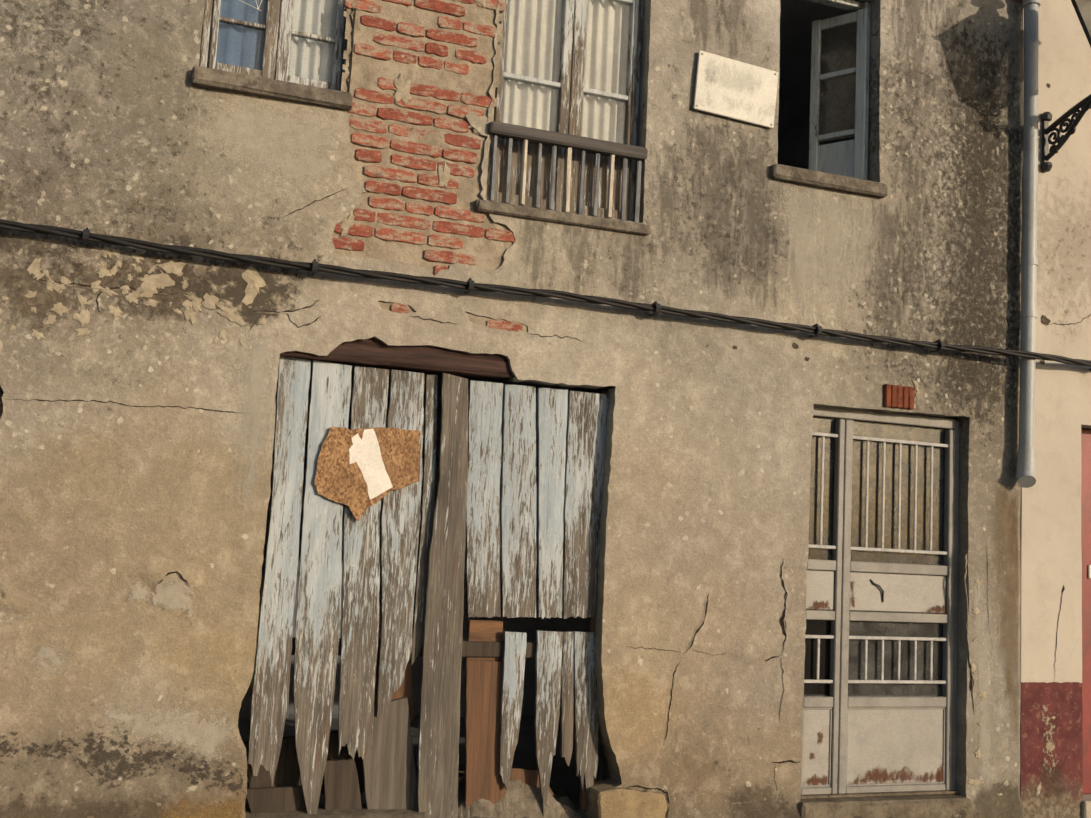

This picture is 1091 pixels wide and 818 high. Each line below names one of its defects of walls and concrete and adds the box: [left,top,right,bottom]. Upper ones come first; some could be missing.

flaking render [332,0,515,276]